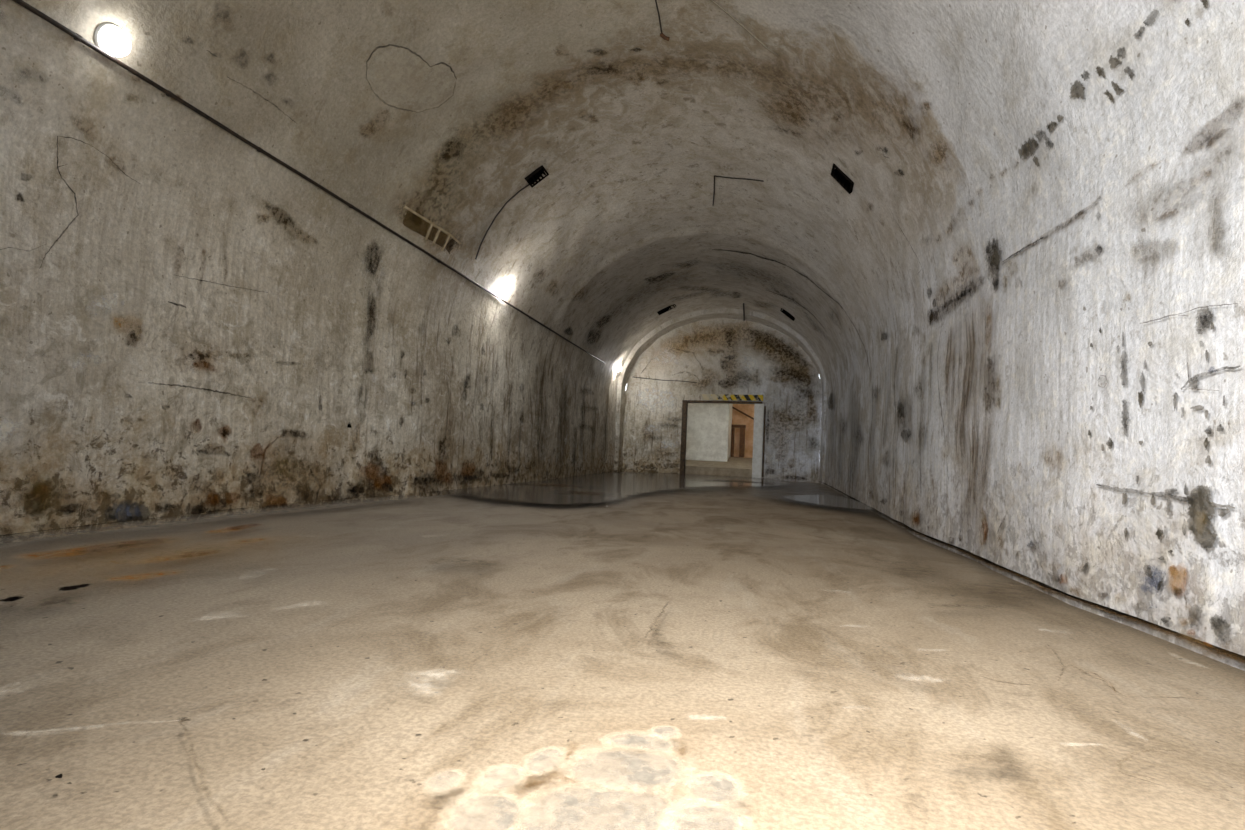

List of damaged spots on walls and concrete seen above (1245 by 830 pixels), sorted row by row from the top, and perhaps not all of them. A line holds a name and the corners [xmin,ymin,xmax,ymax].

peeling [1069,47,1134,102]
peeling [1018,115,1064,167]
water stain [682,332,924,484]
water stain [915,313,1000,509]
water stain [251,430,319,509]
water stain [86,492,176,524]
peeling [1165,484,1230,550]